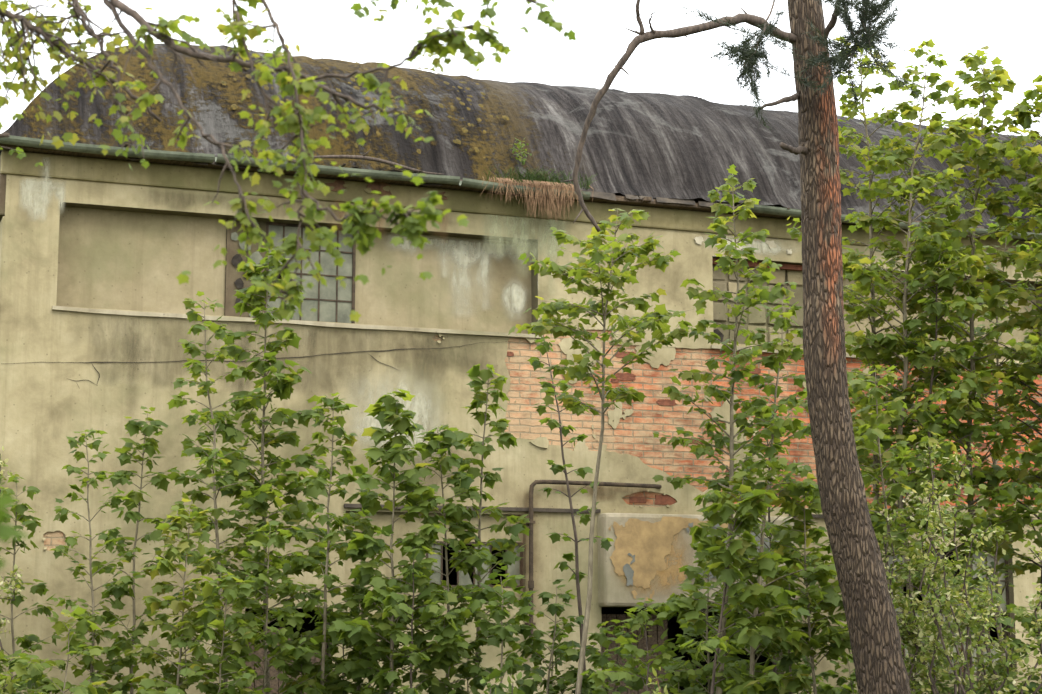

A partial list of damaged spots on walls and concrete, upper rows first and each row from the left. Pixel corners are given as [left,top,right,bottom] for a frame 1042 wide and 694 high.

water stain [22,160,64,214]
flaking render [504,319,818,508]
flaking render [846,357,967,445]
flaking render [865,362,1042,513]
peeling [608,489,728,601]
peeling [751,523,781,552]